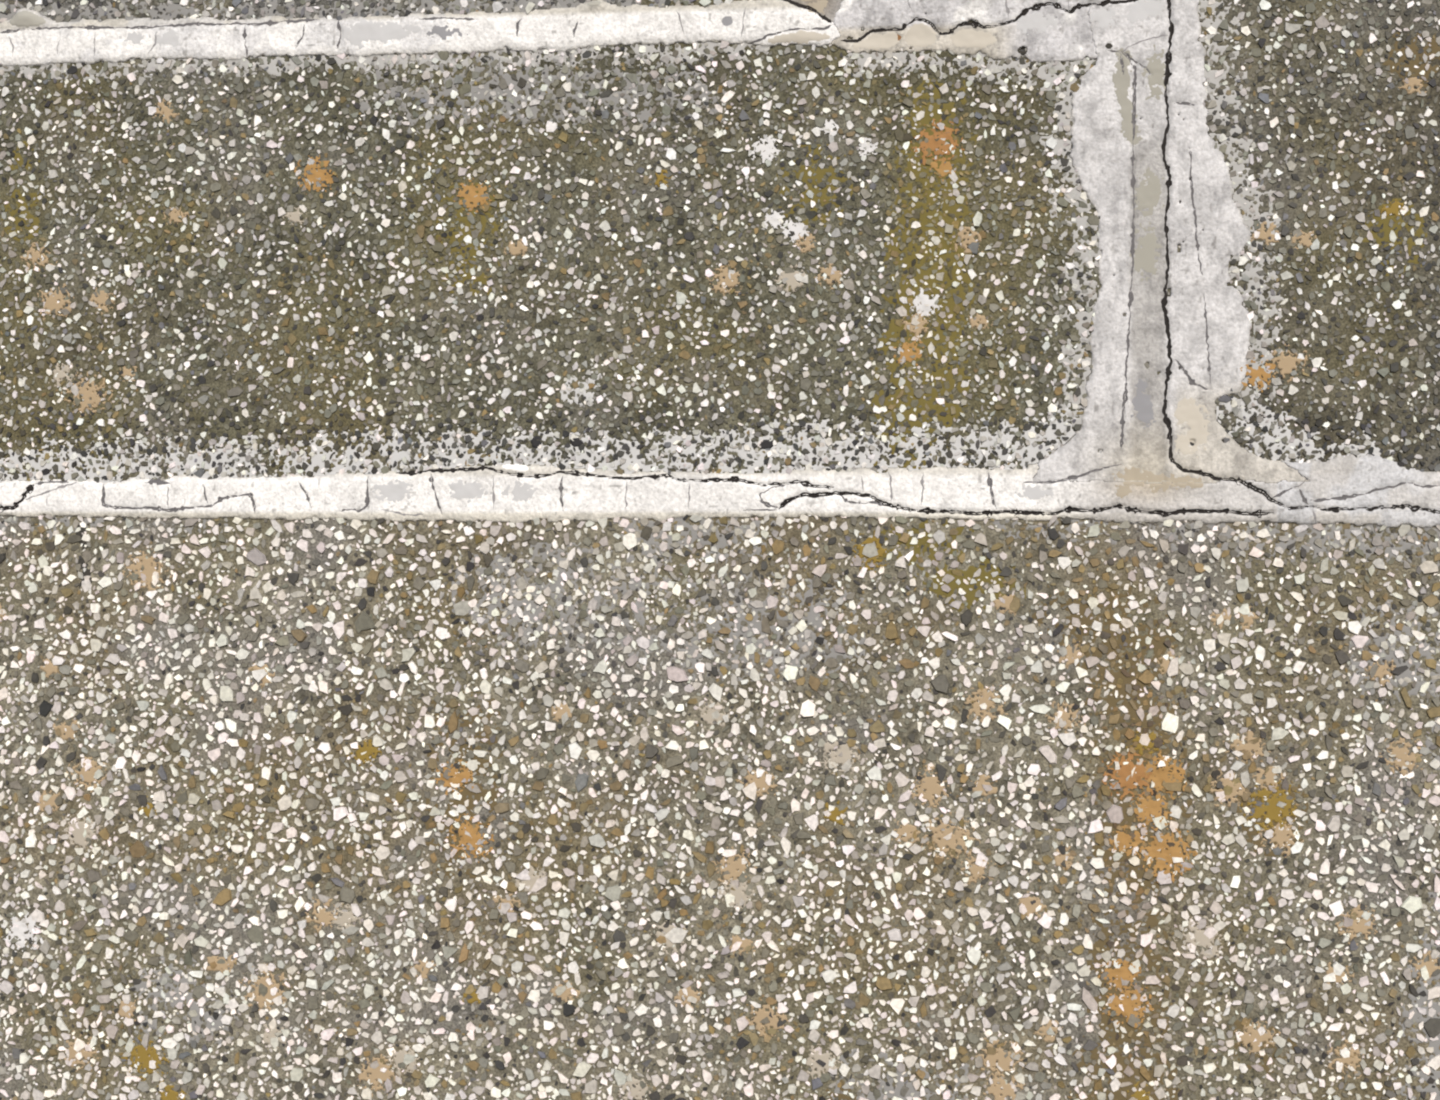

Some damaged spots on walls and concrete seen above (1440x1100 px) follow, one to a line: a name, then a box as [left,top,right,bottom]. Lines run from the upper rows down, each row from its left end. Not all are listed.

crack [0,478,256,513]
crack [299,0,1440,524]